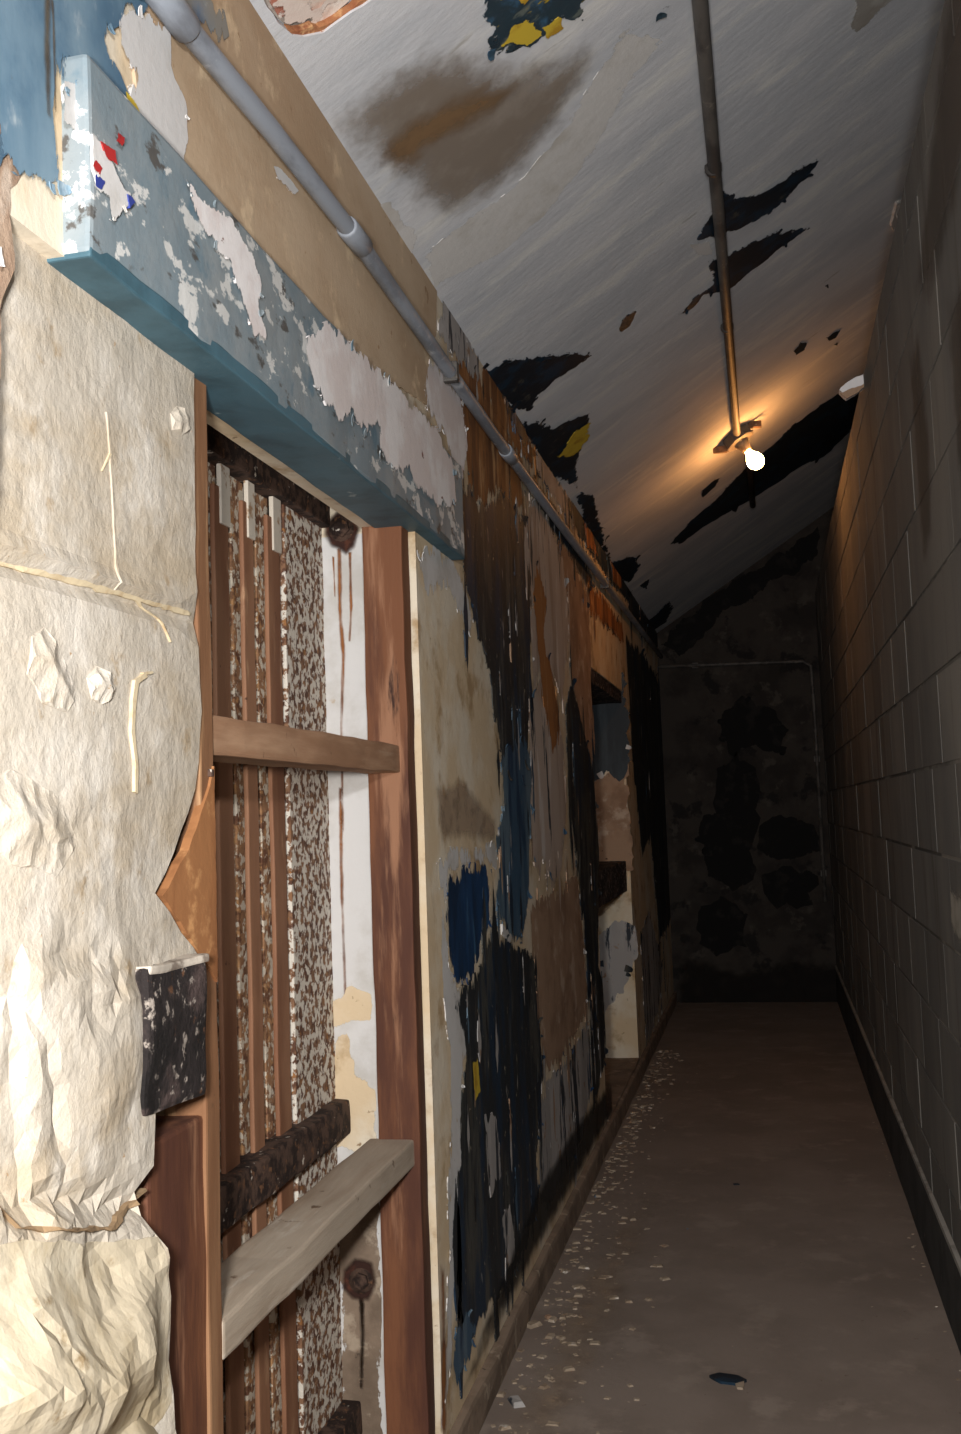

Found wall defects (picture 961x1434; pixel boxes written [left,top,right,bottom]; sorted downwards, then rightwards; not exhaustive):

spalling [264,0,367,35]
peeling [0,0,190,221]
peeling [187,181,266,340]
peeling [274,166,299,194]
peeling [381,202,417,253]
damp [358,65,579,207]
peeling [682,159,819,315]
peeling [671,393,859,544]
peeling [306,301,820,1434]
crack [0,1188,147,1233]